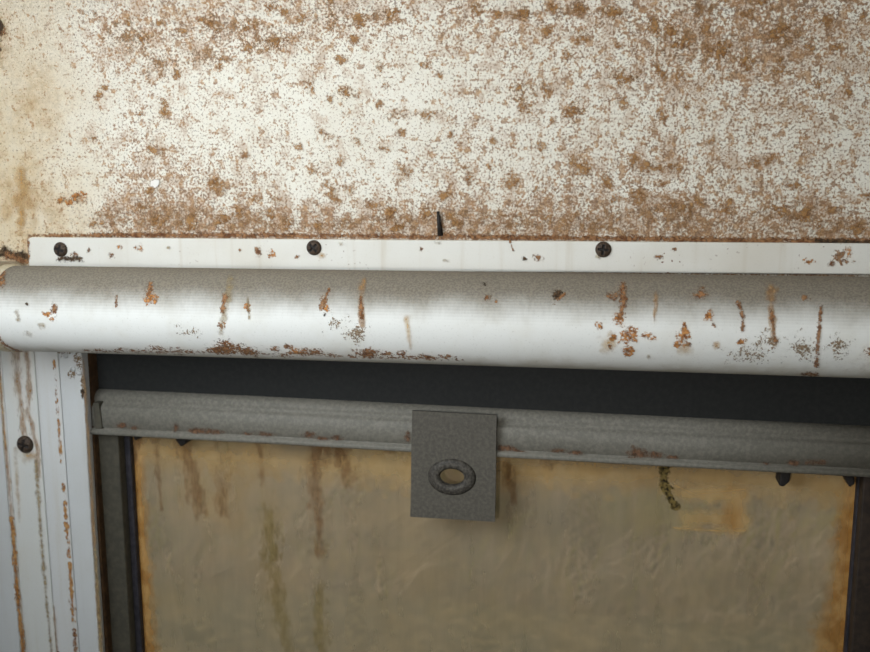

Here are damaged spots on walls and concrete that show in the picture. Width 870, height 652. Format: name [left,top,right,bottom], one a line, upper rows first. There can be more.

corrosion [106,9,300,80]
corrosion [266,0,401,45]
corrosion [647,0,756,81]
corrosion [376,100,436,137]
corrosion [0,154,870,266]
corrosion [85,278,463,361]
corrosion [606,282,656,357]
corrosion [673,322,692,348]
corrosion [724,286,779,364]
corrosion [790,306,850,376]
corrosion [9,506,25,652]
corrosion [62,483,78,652]